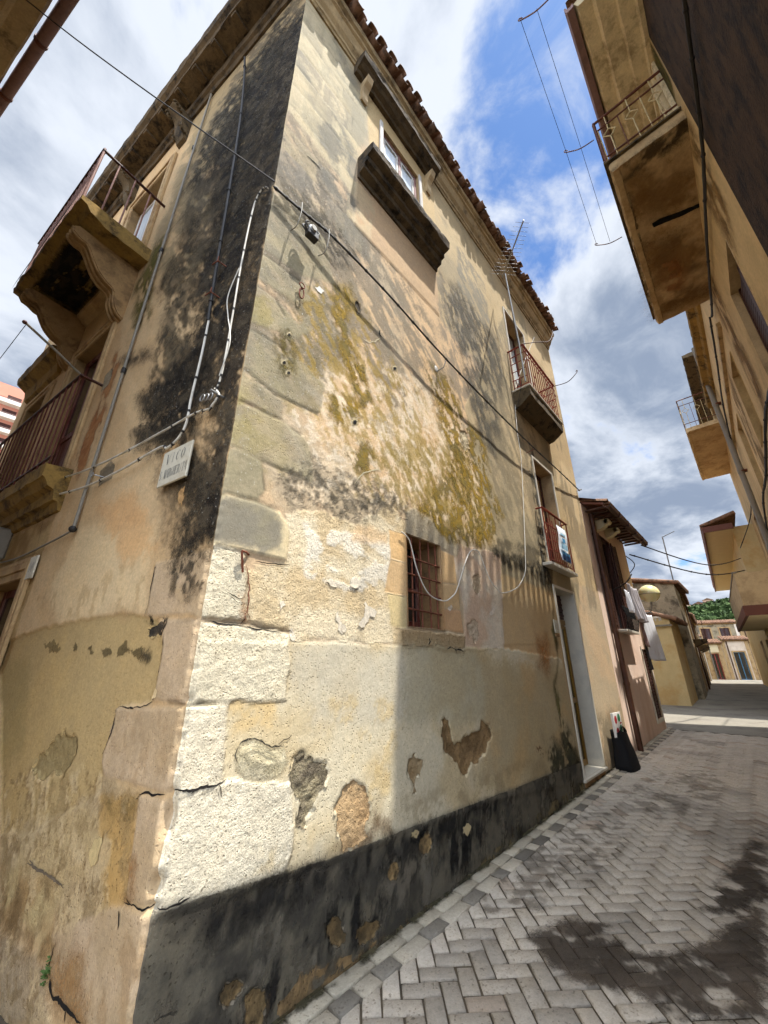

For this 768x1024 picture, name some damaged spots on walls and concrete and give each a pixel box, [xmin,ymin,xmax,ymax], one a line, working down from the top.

leakage [123,6,354,597]
leakage [448,286,504,453]
leakage [286,462,402,518]
spalling [73,617,167,659]
spalling [30,731,78,784]
crack [136,736,291,799]
spalling [290,750,328,829]
spalling [334,780,372,852]
spalling [407,753,424,796]
spalling [440,717,492,779]
crack [27,860,63,888]
crack [49,945,80,1024]